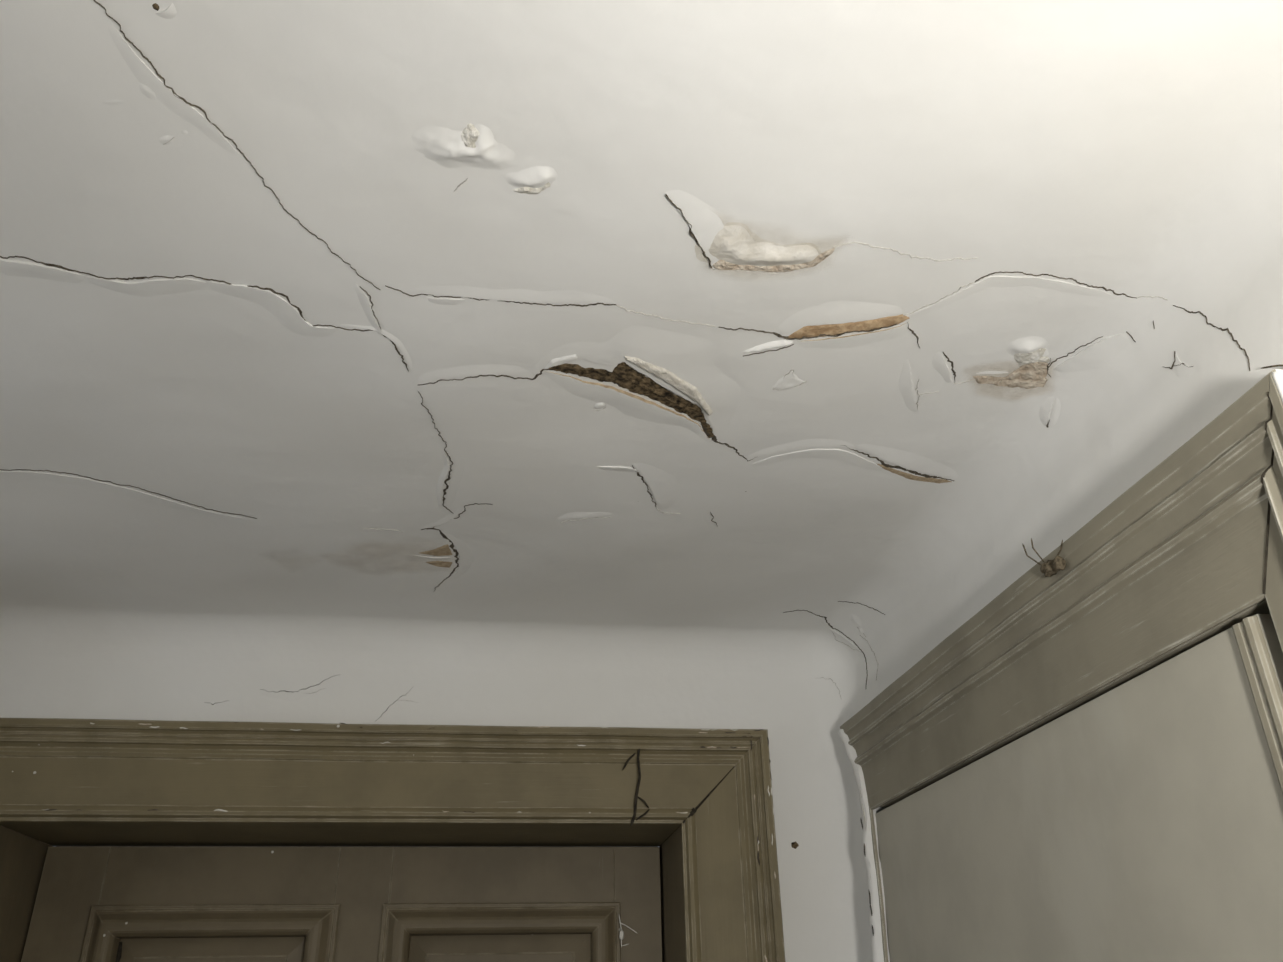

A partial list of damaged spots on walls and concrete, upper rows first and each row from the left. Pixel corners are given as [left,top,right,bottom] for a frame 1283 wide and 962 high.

crack [0,0,1250,591]
spalling [972,333,1129,428]
spalling [414,544,453,568]